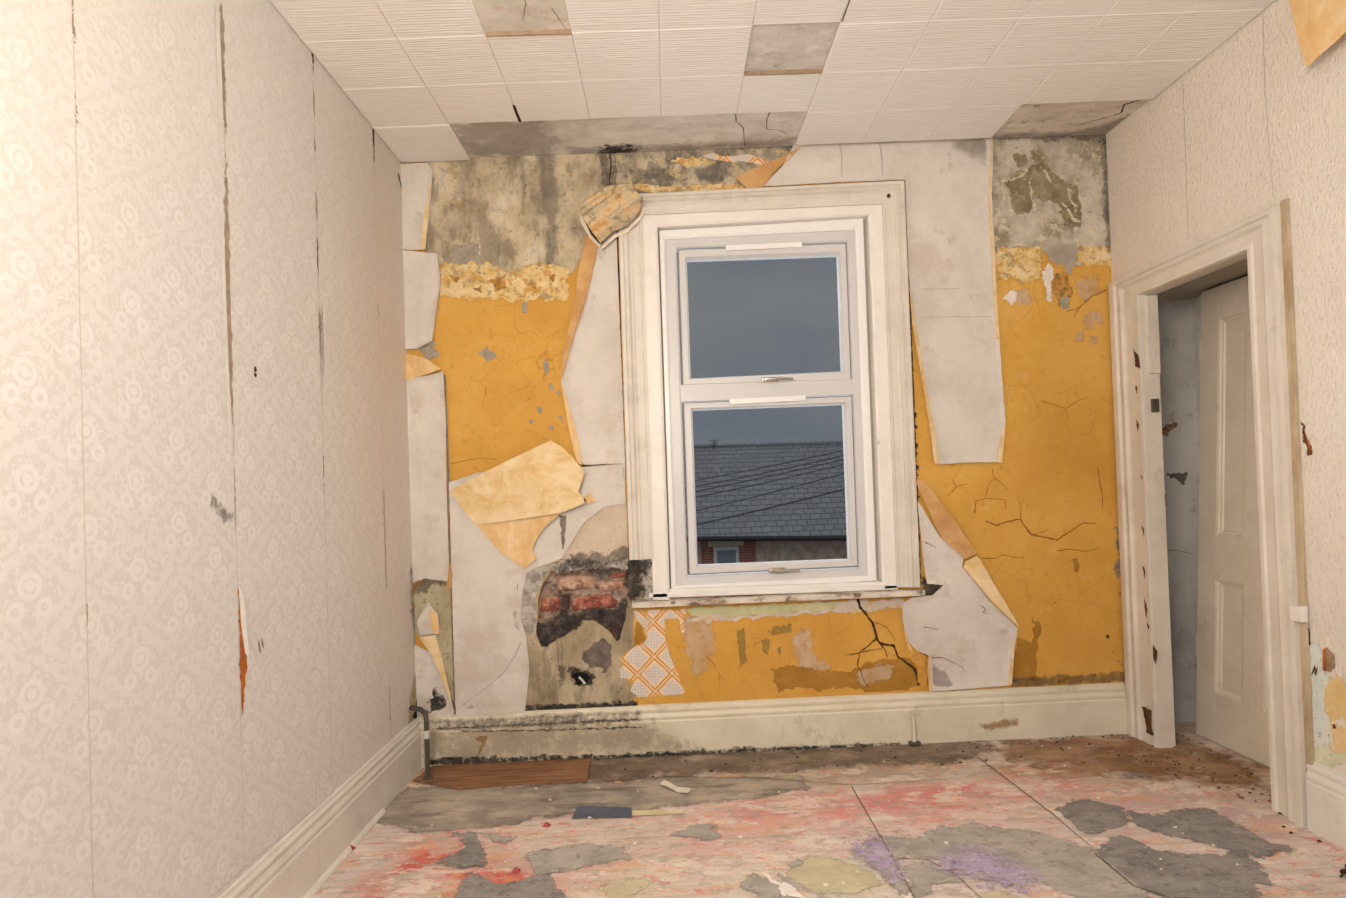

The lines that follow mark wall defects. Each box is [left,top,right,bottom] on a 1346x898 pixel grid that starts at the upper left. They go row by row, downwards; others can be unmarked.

peeling [473,0,572,37]
peeling [744,22,840,76]
peeling [1290,0,1346,67]
flaking render [991,100,1147,344]
crack [947,467,1103,559]
spalling [450,406,653,711]
spalling [922,576,943,596]
flaking render [414,578,455,701]
peeling [771,630,929,693]
crack [847,599,919,688]
peeling [1012,619,1041,682]
flaking render [1308,623,1346,768]